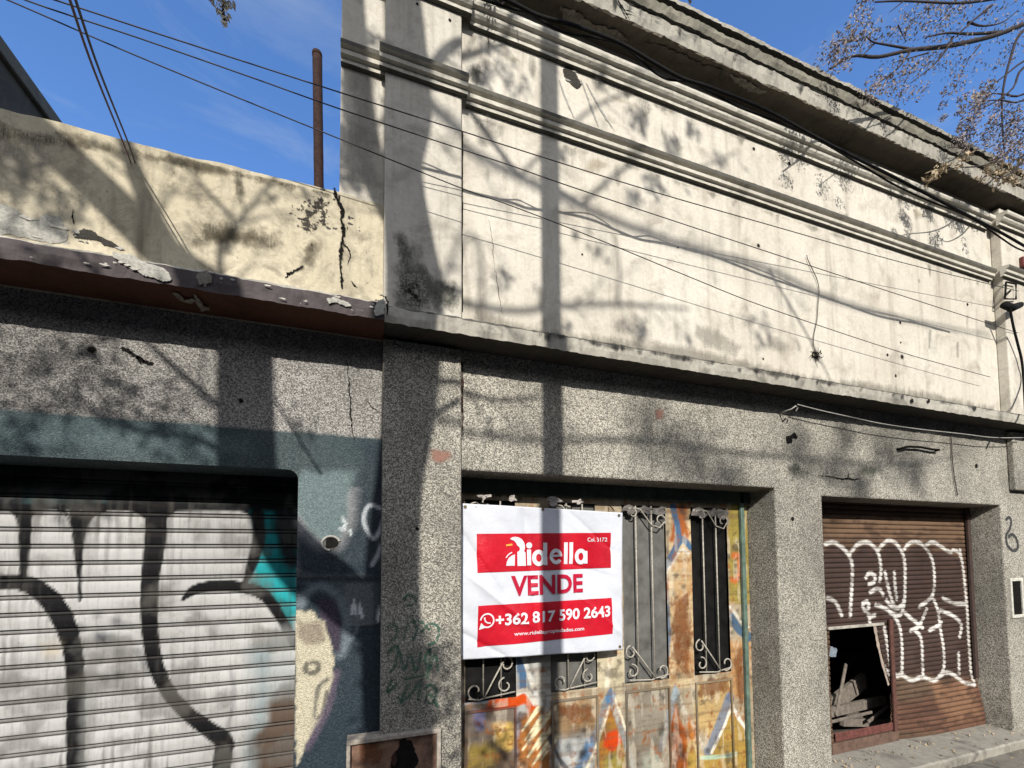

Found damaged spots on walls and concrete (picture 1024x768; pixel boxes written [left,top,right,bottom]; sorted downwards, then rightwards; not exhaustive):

peeling [61,229,171,281]
peeling [173,270,235,312]
peeling [289,188,360,245]
peeling [327,296,351,307]
crack [333,188,357,289]
damp [397,237,455,309]
crack [347,364,380,439]